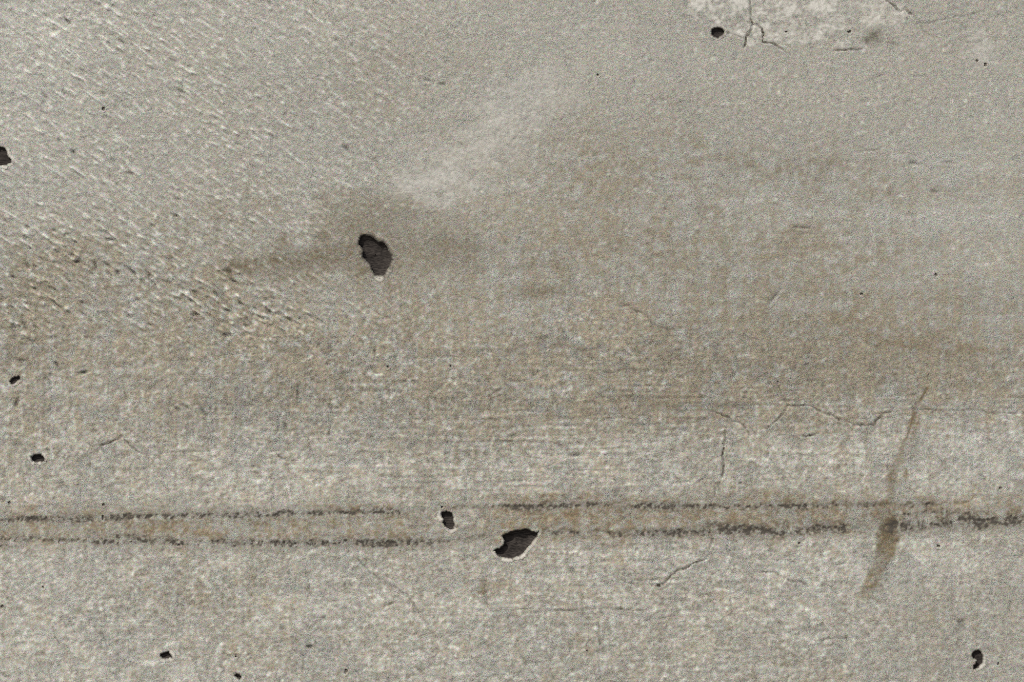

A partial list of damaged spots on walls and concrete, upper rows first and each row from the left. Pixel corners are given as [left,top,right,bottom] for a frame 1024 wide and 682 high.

crack [724,0,790,55]
crack [834,46,863,54]
damp [0,502,503,556]
damp [624,384,1024,602]
crack [706,382,1024,497]
crack [477,537,714,682]